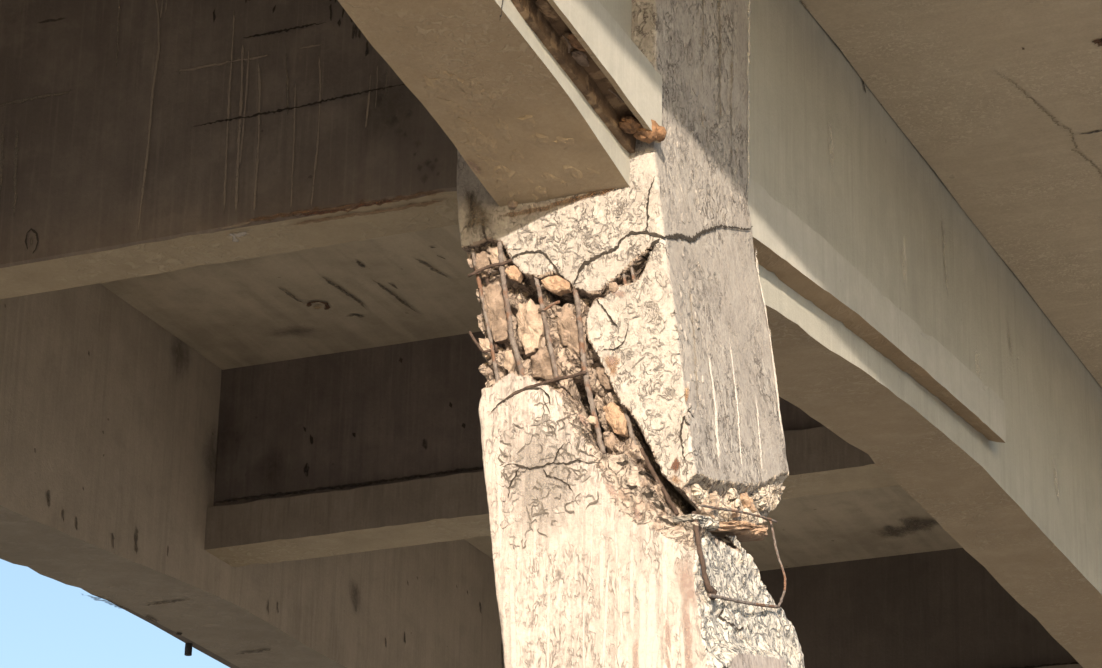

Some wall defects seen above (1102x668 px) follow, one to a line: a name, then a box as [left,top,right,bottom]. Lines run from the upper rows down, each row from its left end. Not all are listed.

crack [243,22,326,38]
crack [193,84,405,127]
crack [997,71,1102,177]
crack [511,176,753,351]
spalling [461,204,805,668]
crack [505,443,588,496]
water stain [882,519,938,536]